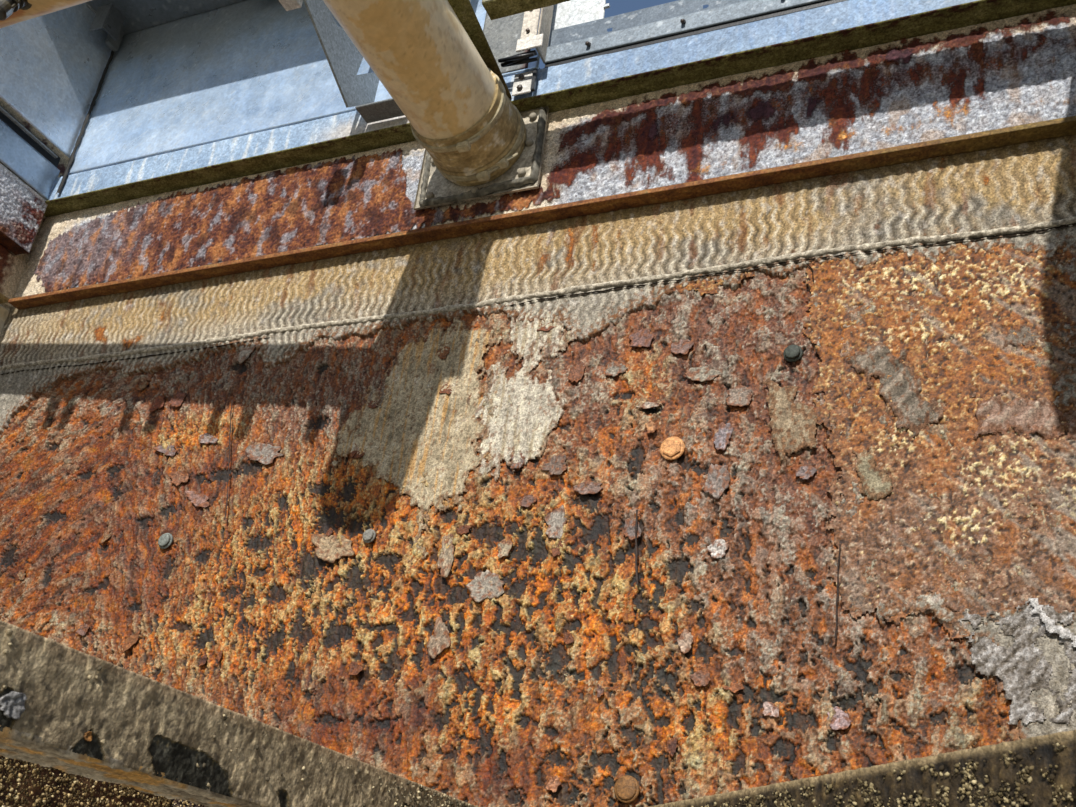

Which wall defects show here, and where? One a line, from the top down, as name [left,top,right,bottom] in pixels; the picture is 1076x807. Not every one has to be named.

corrosion [34,11,1076,292]
peeling [331,304,580,565]
corrosion [0,228,1076,807]